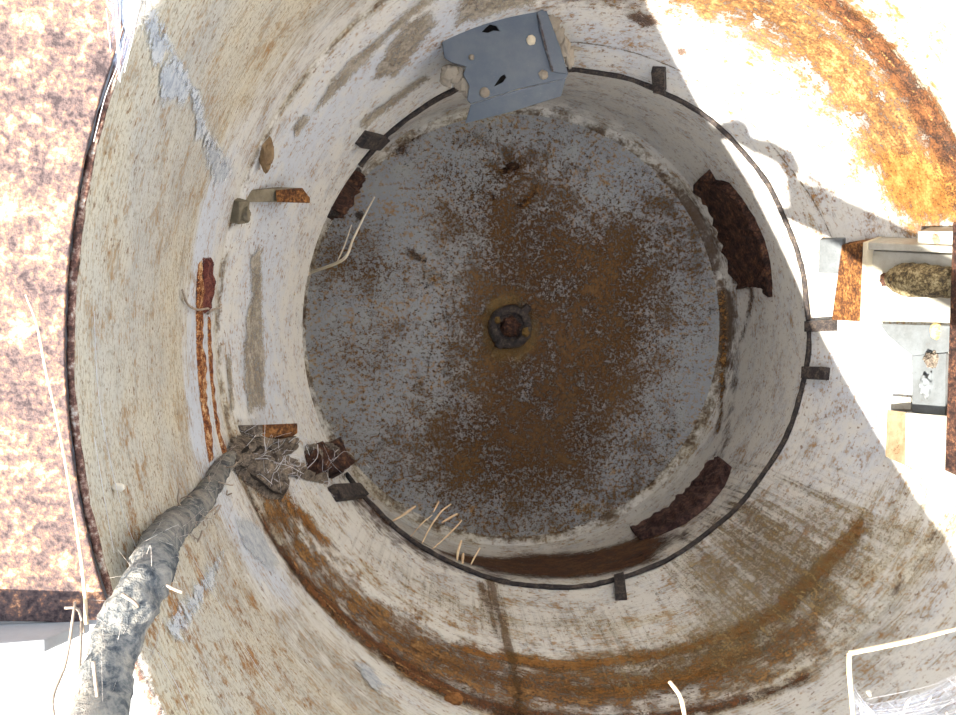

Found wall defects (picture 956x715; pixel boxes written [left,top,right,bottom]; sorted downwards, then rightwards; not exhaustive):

rust [554,0,956,238]
rust [196,257,227,463]
rust [303,116,755,539]
rust [242,481,873,715]